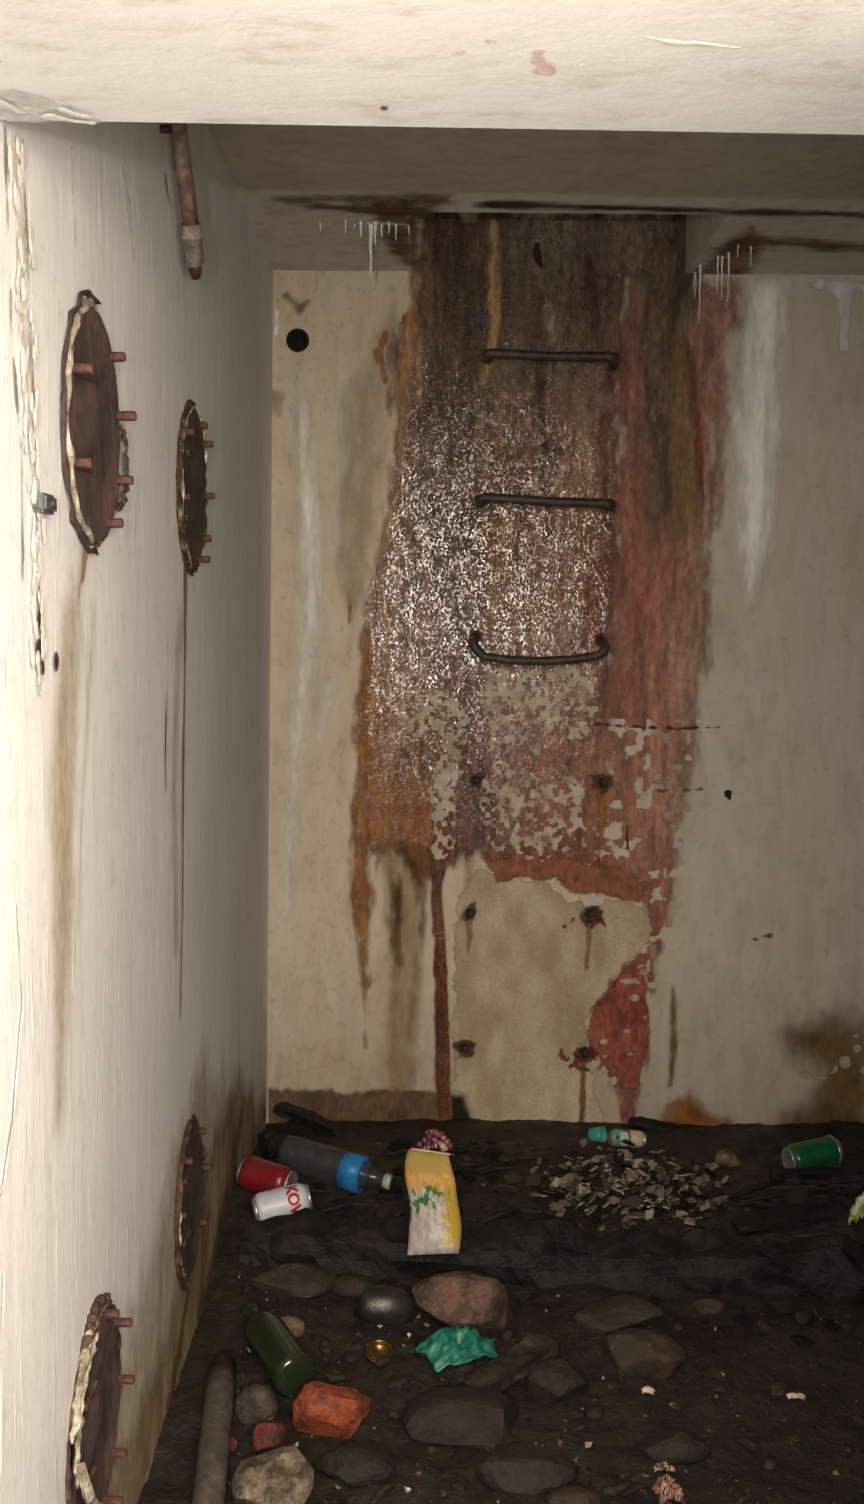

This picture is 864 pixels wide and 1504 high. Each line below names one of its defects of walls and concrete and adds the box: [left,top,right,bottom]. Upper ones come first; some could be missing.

peeling [646,36,742,49]
rust [280,195,447,265]
peeling [533,242,543,268]
damp [811,278,864,352]
damp [734,279,785,596]
rust [479,201,864,1126]
peeling [399,665,599,862]
rust [462,902,476,949]
rust [453,1040,475,1057]
peeling [449,869,653,1123]
damp [783,1019,864,1124]
rust [106,1078,265,1504]